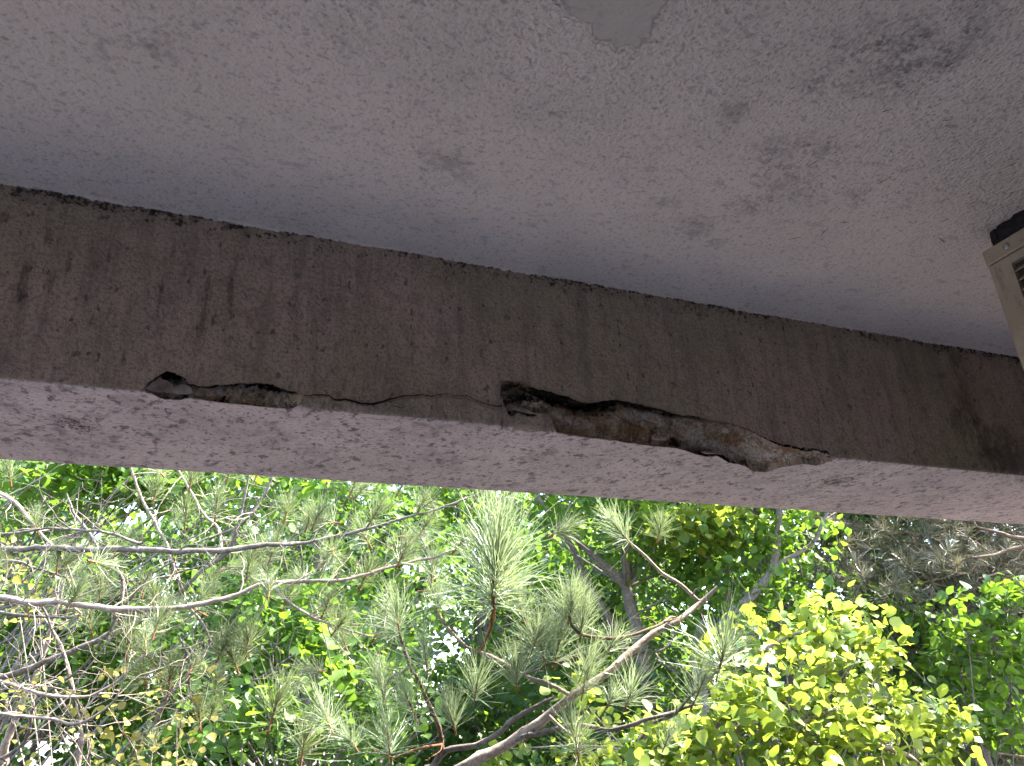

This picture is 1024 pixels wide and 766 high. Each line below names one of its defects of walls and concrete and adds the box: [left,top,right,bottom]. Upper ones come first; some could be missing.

spalling [142,371,302,409]
crack [304,393,503,420]
spalling [501,381,833,472]